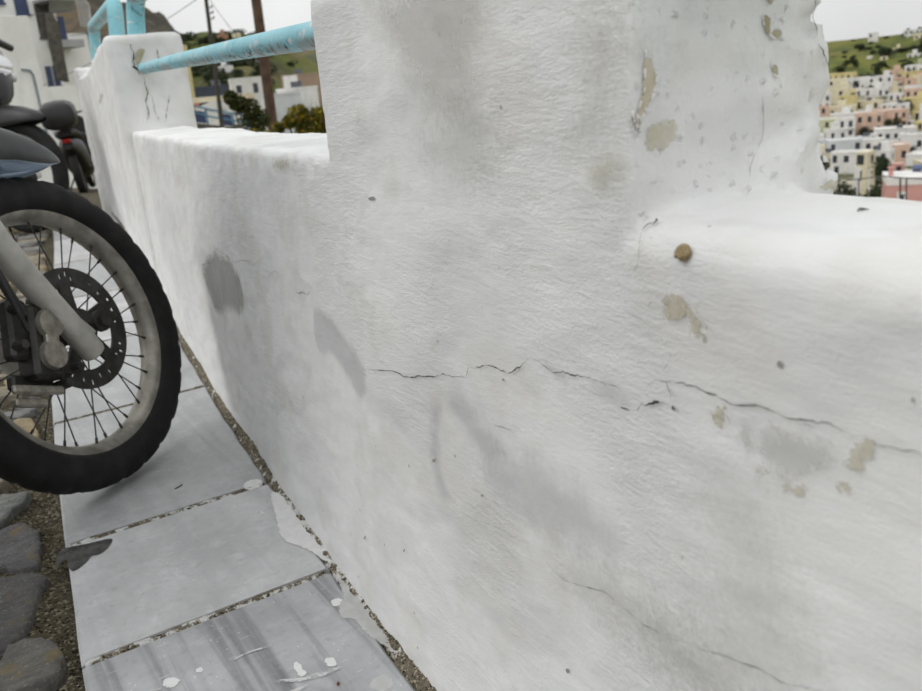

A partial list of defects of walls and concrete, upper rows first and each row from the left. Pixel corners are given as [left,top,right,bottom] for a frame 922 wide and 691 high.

peeling [631,50,677,150]
peeling [661,294,708,338]
crack [369,358,922,455]